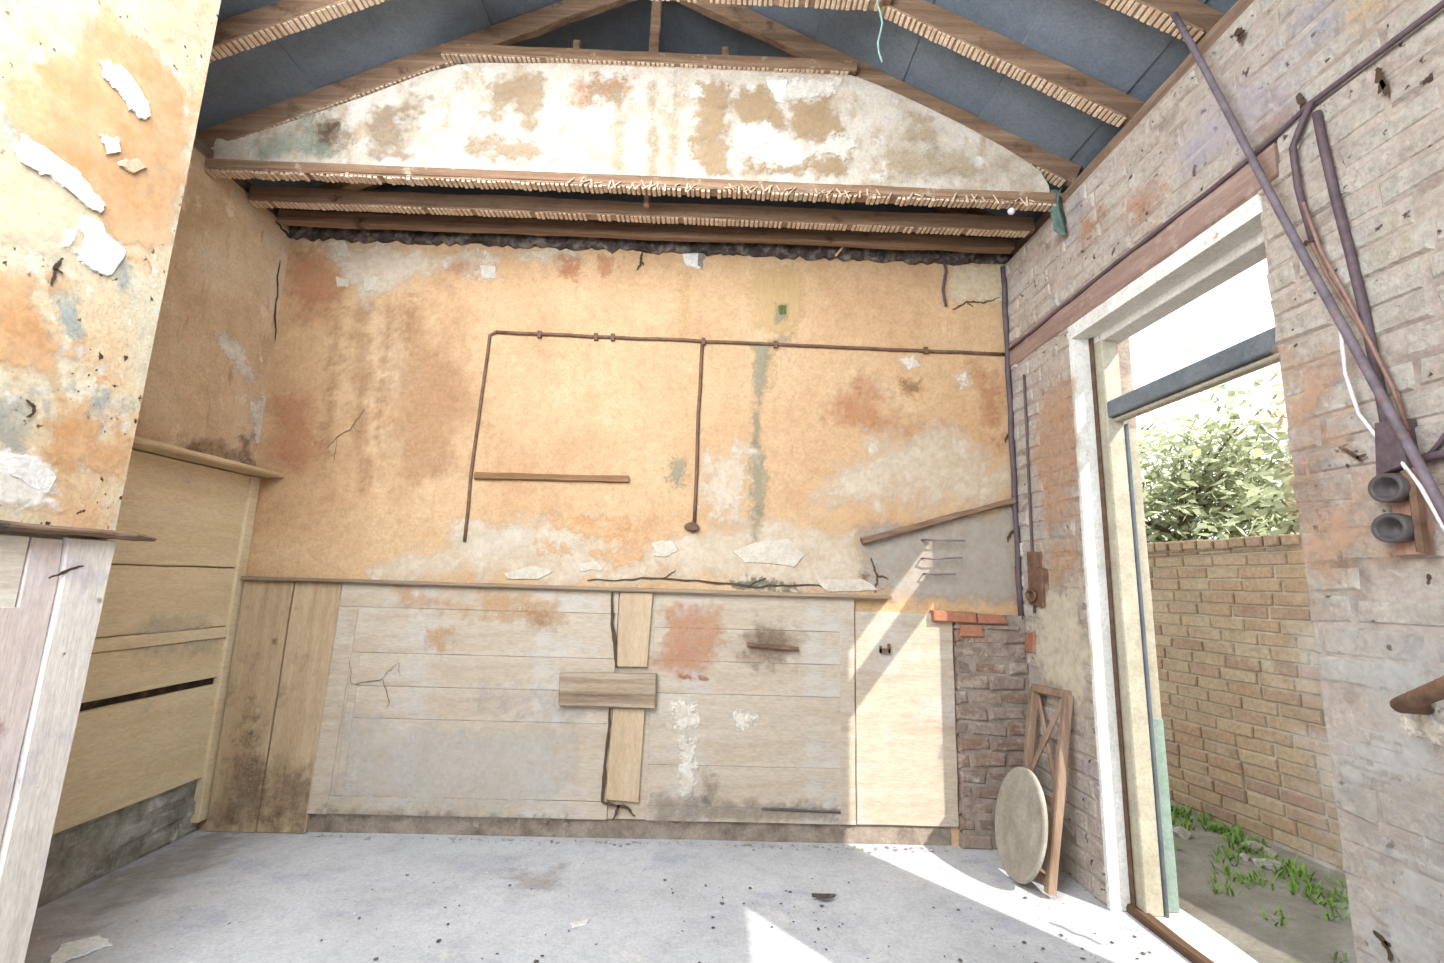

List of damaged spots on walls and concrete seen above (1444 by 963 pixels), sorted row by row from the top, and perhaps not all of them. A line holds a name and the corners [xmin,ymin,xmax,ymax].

flaking render [681,82,708,98]
flaking render [765,73,842,103]
flaking render [6,10,186,277]
flaking render [730,121,858,168]
flaking render [367,508,878,594]
leakage [744,630,786,659]
crack [601,708,635,821]
leakage [103,731,309,908]